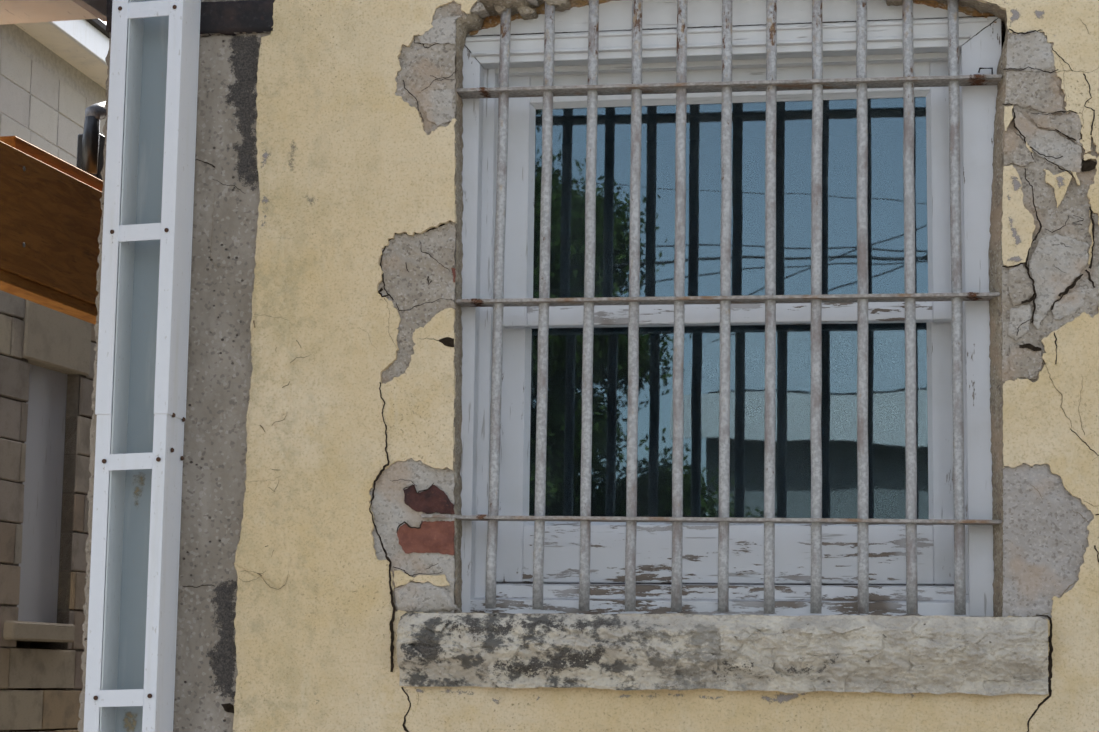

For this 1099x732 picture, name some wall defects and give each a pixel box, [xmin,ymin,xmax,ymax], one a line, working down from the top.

spalling [395,0,571,135]
crack [1052,48,1099,135]
spalling [1001,2,1099,383]
spalling [378,221,456,384]
crack [1045,332,1099,461]
crack [369,382,419,732]
spalling [369,458,460,613]
spalling [1002,463,1094,620]
crack [1027,615,1053,732]